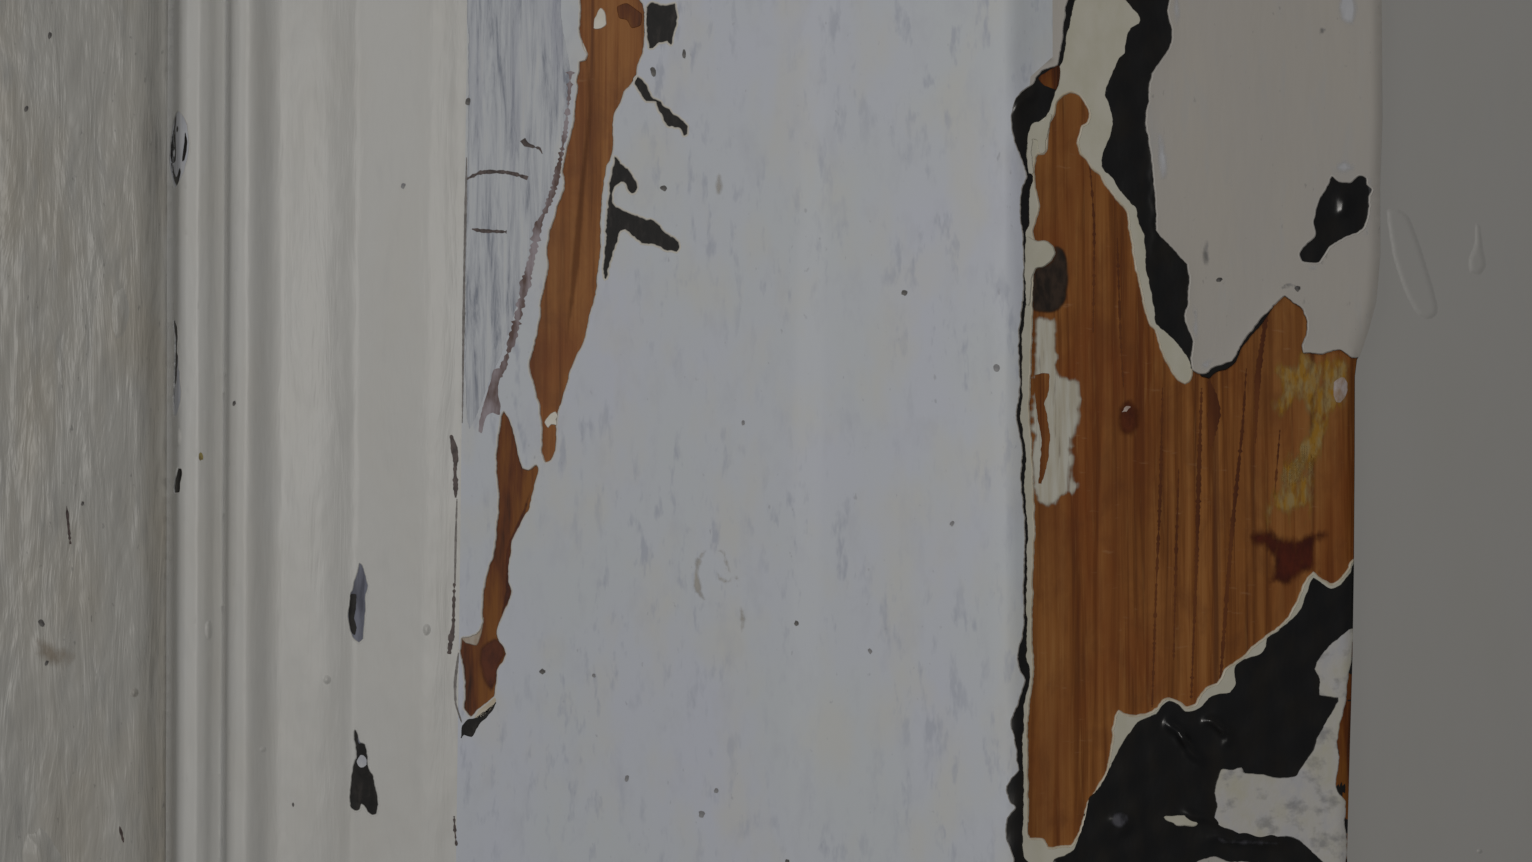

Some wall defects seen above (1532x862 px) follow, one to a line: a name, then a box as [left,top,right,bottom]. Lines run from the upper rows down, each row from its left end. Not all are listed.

spalling [168,109,191,189]
spalling [1298,174,1373,265]
peeling [458,0,689,738]
peeling [1005,0,1358,862]
spalling [347,562,369,644]
spalling [348,728,380,817]